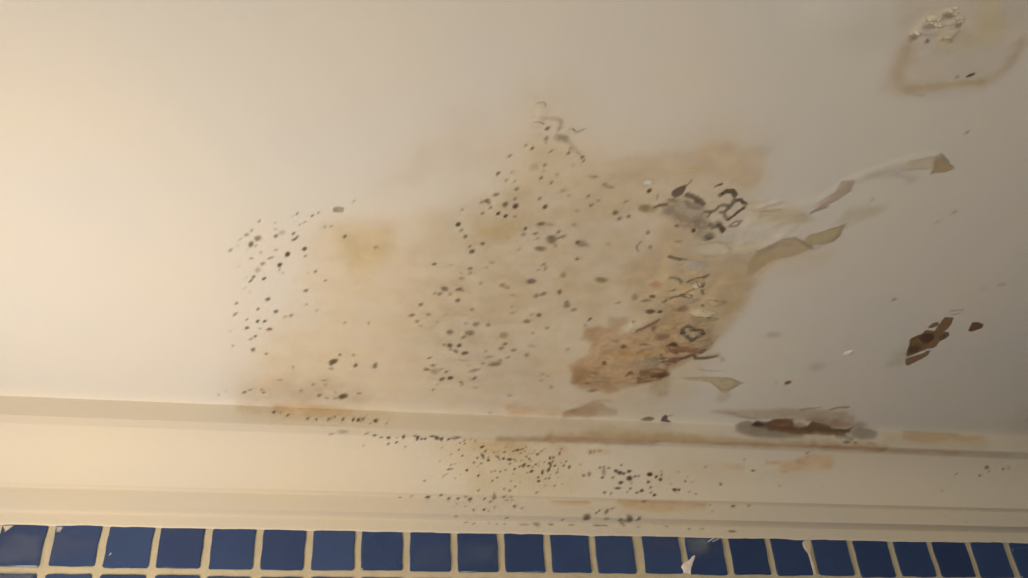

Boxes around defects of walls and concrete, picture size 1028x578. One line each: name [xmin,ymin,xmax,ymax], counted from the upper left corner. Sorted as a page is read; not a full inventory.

flaking render [899,6,966,45]
damp [653,149,755,237]
damp [634,245,739,332]
flaking render [572,150,953,391]
damp [373,435,570,493]
damp [601,467,662,496]